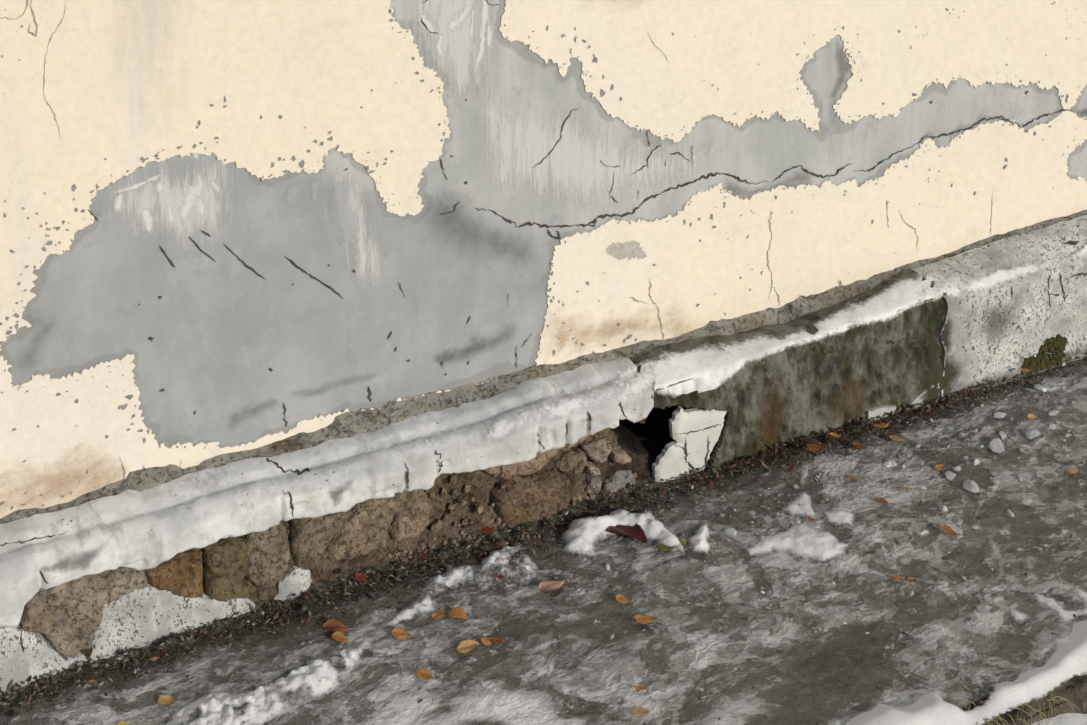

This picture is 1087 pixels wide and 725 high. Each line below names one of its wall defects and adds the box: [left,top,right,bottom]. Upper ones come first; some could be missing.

crack [0,0,66,139]
peeling [0,0,1087,448]
crack [440,108,1072,242]
crack [767,214,807,307]
spalling [19,269,946,664]